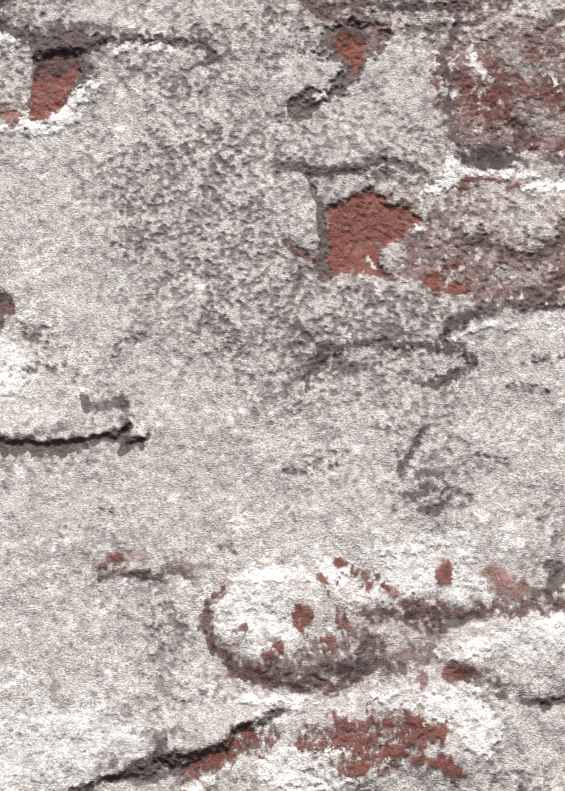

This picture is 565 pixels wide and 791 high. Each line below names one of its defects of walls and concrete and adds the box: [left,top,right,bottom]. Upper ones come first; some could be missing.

spalling [0,49,81,126]
spalling [287,18,392,122]
spalling [430,23,565,161]
spalling [326,185,565,307]
crack [0,393,150,459]
spalling [161,578,437,791]
spalling [442,659,510,707]
crack [68,706,291,791]
spalling [289,701,468,791]